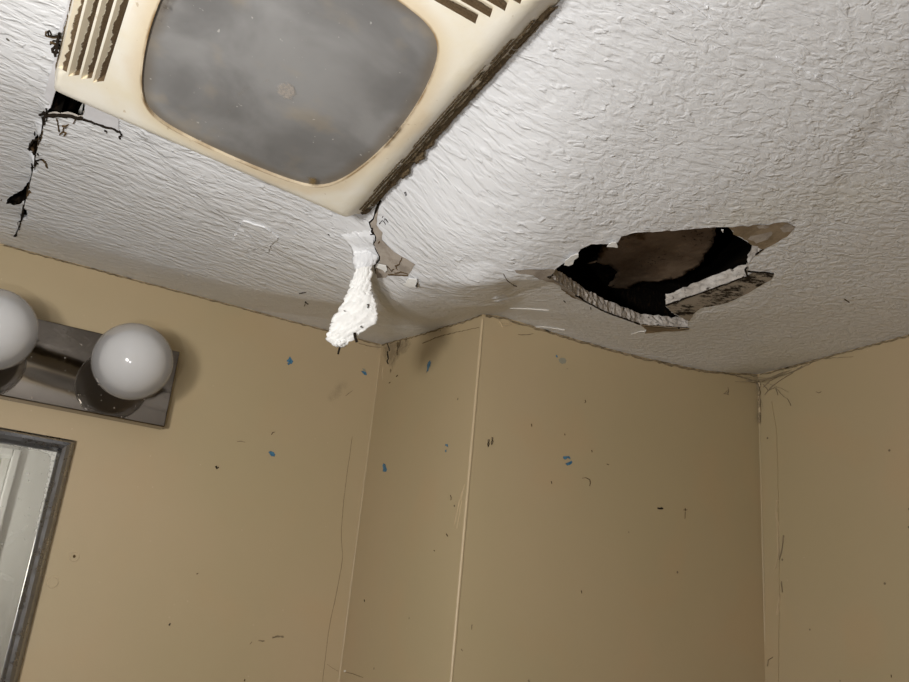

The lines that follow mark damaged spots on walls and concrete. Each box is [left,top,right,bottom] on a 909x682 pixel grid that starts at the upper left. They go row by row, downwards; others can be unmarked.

crack [0,91,329,332]
peeling [325,200,417,354]
crack [357,315,909,382]
spalling [551,224,794,334]